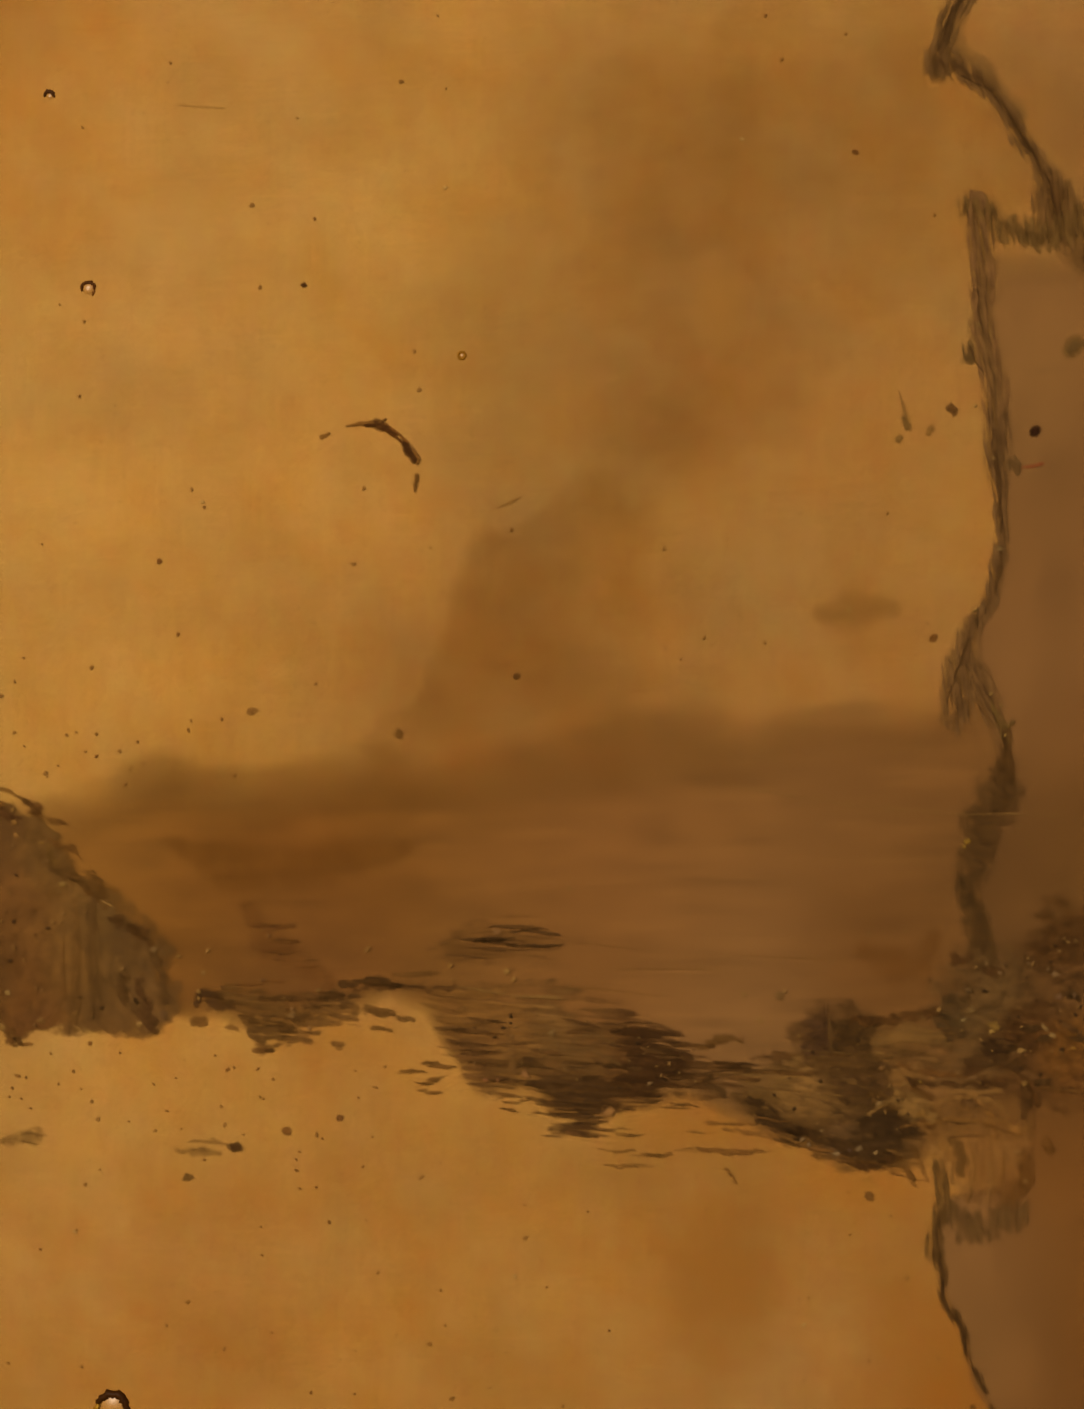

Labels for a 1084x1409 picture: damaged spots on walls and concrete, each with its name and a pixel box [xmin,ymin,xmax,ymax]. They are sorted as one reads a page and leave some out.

peeling [0,787,180,1047]
water stain [53,273,1084,1409]
crack [925,1161,1030,1409]
crack [924,0,1084,1006]